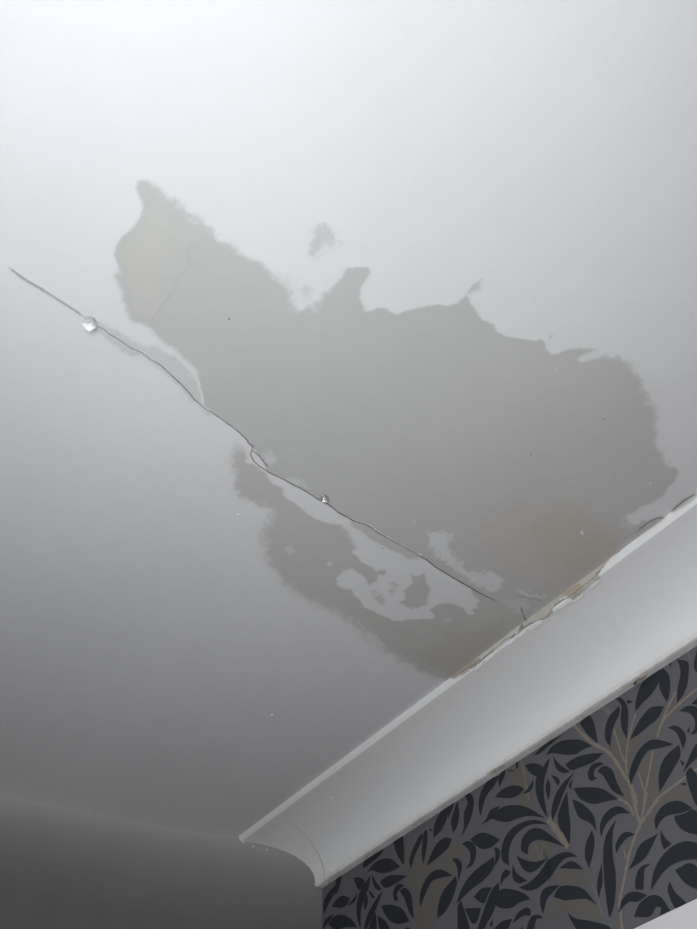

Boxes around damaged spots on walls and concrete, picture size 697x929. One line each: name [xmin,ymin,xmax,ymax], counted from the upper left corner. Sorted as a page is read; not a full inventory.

crack [0,258,496,601]
water stain [91,175,681,682]